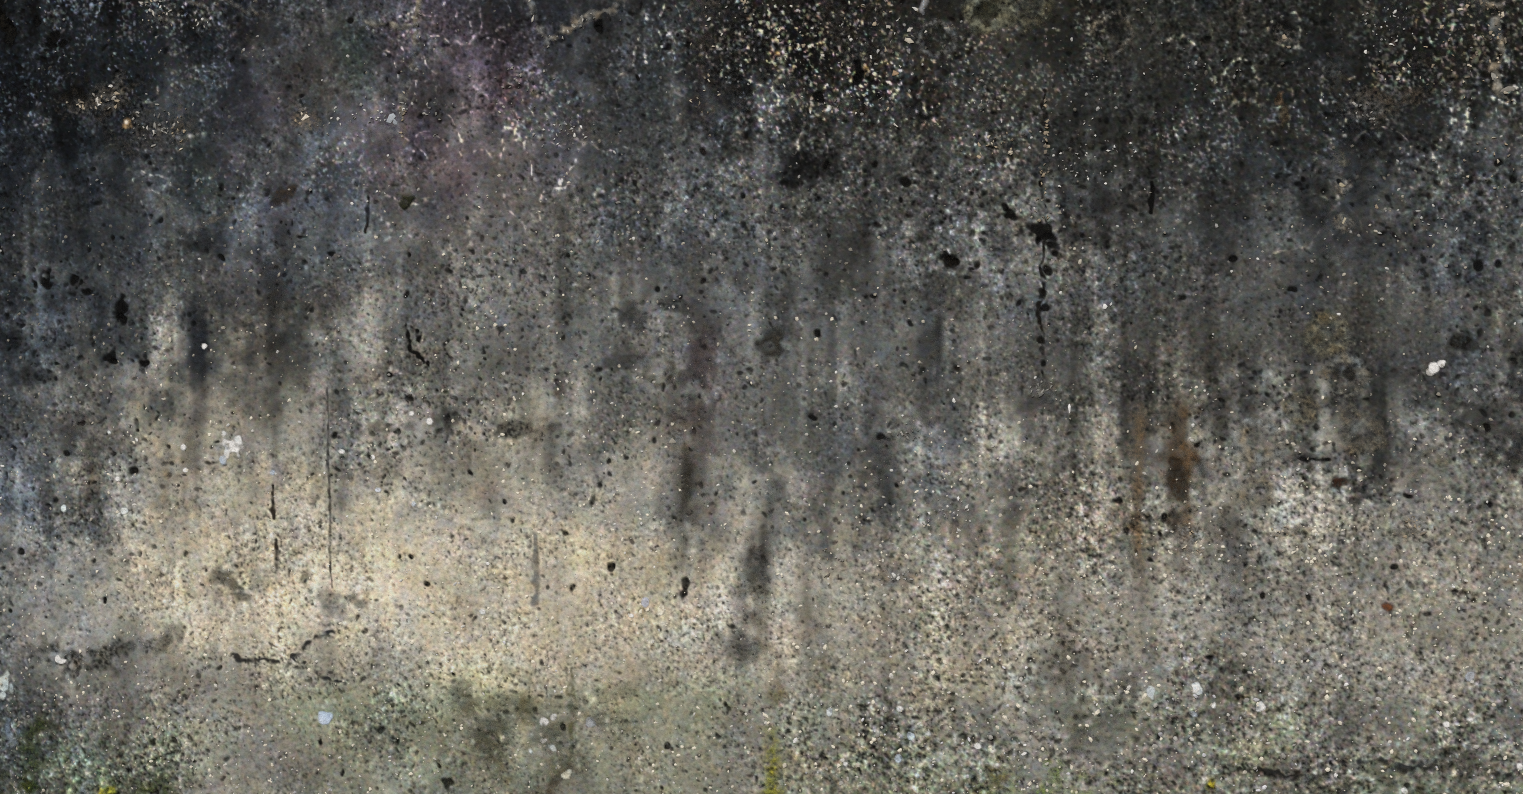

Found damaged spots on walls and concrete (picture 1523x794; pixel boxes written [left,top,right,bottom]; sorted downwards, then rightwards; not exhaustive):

leakage [1450,331,1472,350]
leakage [497,420,531,439]
leakage [681,459,692,518]
rust [1166,404,1191,532]
leakage [749,523,769,591]
leakage [48,639,130,678]